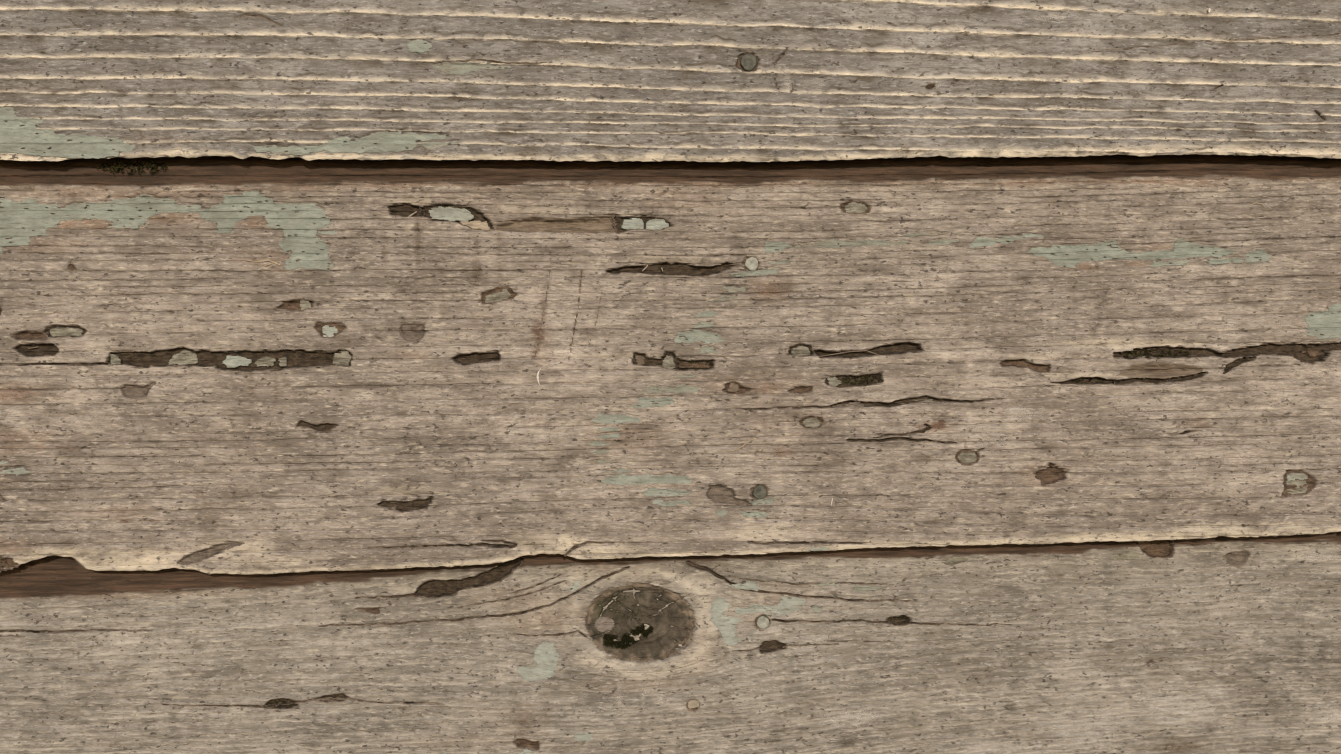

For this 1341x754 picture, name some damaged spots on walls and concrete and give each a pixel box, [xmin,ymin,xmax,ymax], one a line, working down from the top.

peeling [0,106,136,159]
peeling [0,190,337,272]
crack [606,262,741,277]
peeling [1304,303,1341,340]
crack [787,342,923,359]
crack [1113,342,1341,374]
crack [743,359,1052,452]